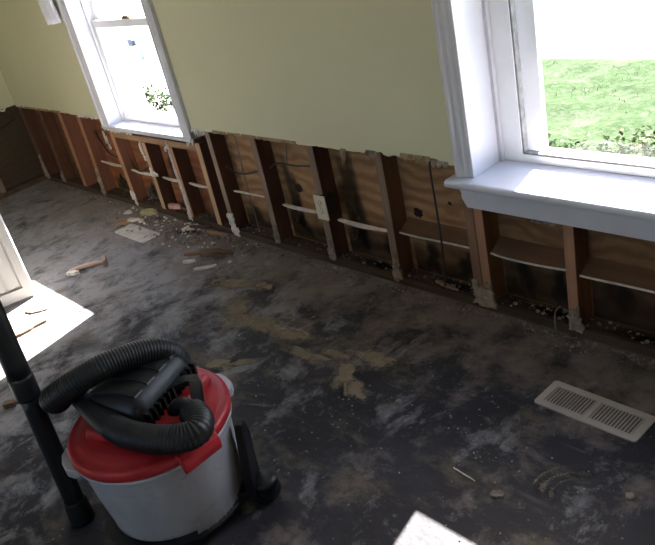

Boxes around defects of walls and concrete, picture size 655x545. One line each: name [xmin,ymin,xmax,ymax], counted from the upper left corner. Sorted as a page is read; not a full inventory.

flaking render [164,141,193,221]
flaking render [226,213,241,237]
damp [284,166,327,244]
damp [339,163,393,269]
flaking render [327,237,336,261]
flaking render [391,252,404,282]
flaking render [471,278,497,309]
flaking render [568,307,585,334]